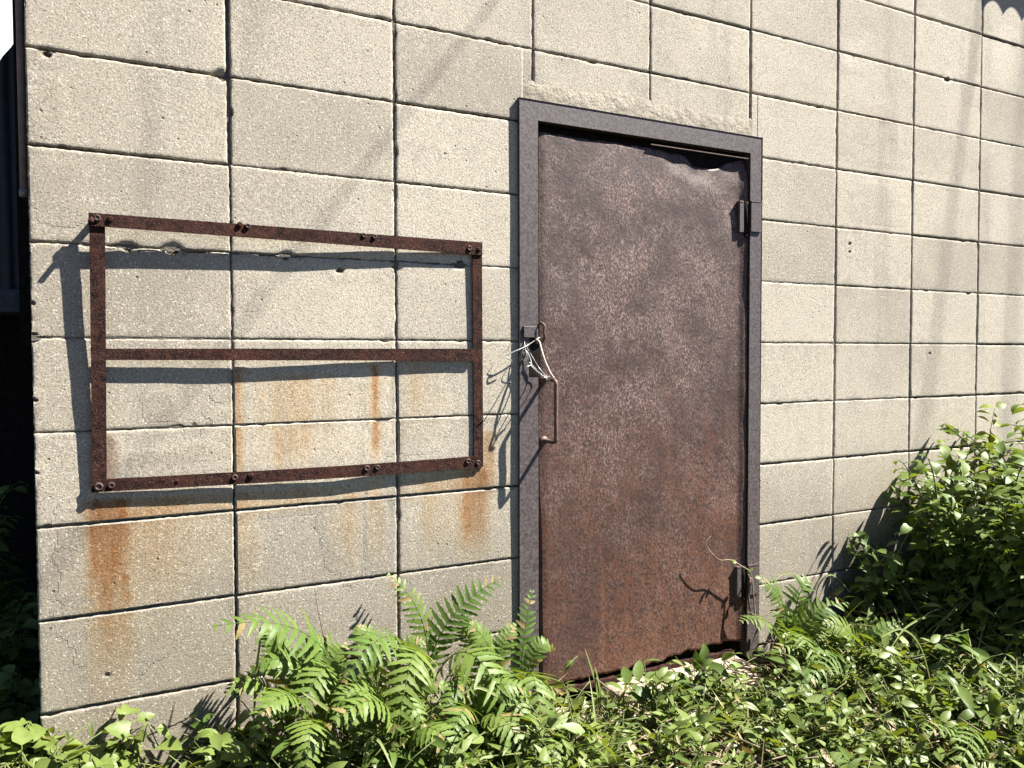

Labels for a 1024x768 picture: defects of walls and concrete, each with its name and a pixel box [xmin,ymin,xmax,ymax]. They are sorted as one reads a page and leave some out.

crack [106,247,221,255]
corrosion [52,361,509,747]